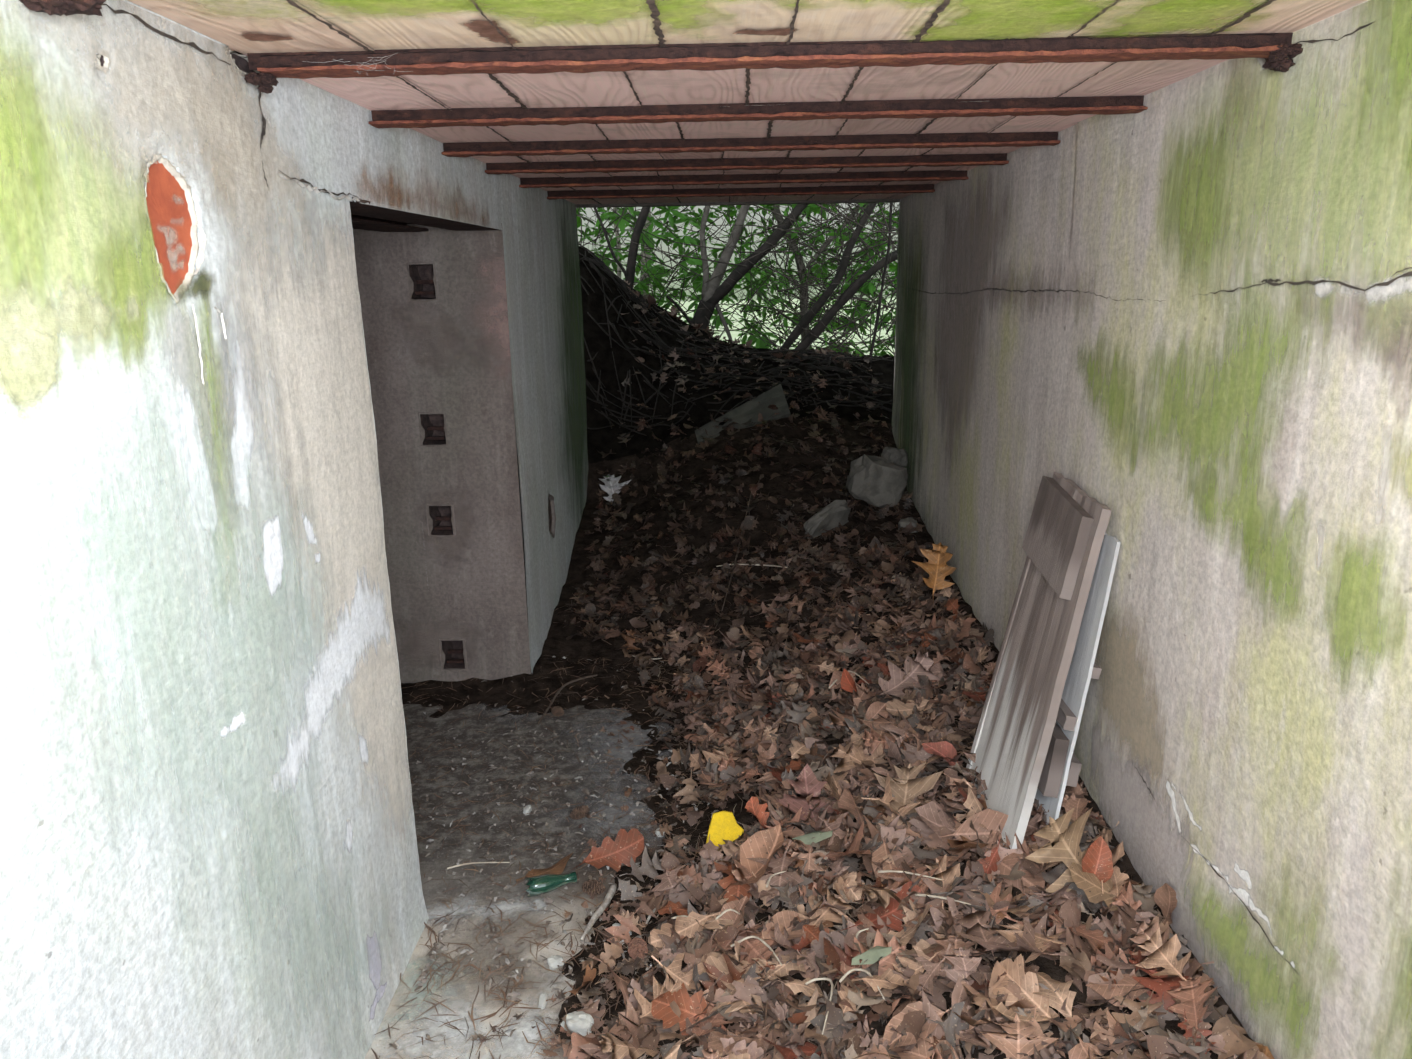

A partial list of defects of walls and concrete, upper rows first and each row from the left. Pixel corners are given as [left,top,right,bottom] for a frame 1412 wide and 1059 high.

water stain [0,284,111,412]
crack [899,267,1412,302]
water stain [1354,276,1412,369]
water stain [1091,616,1249,1036]
crack [1185,839,1307,984]